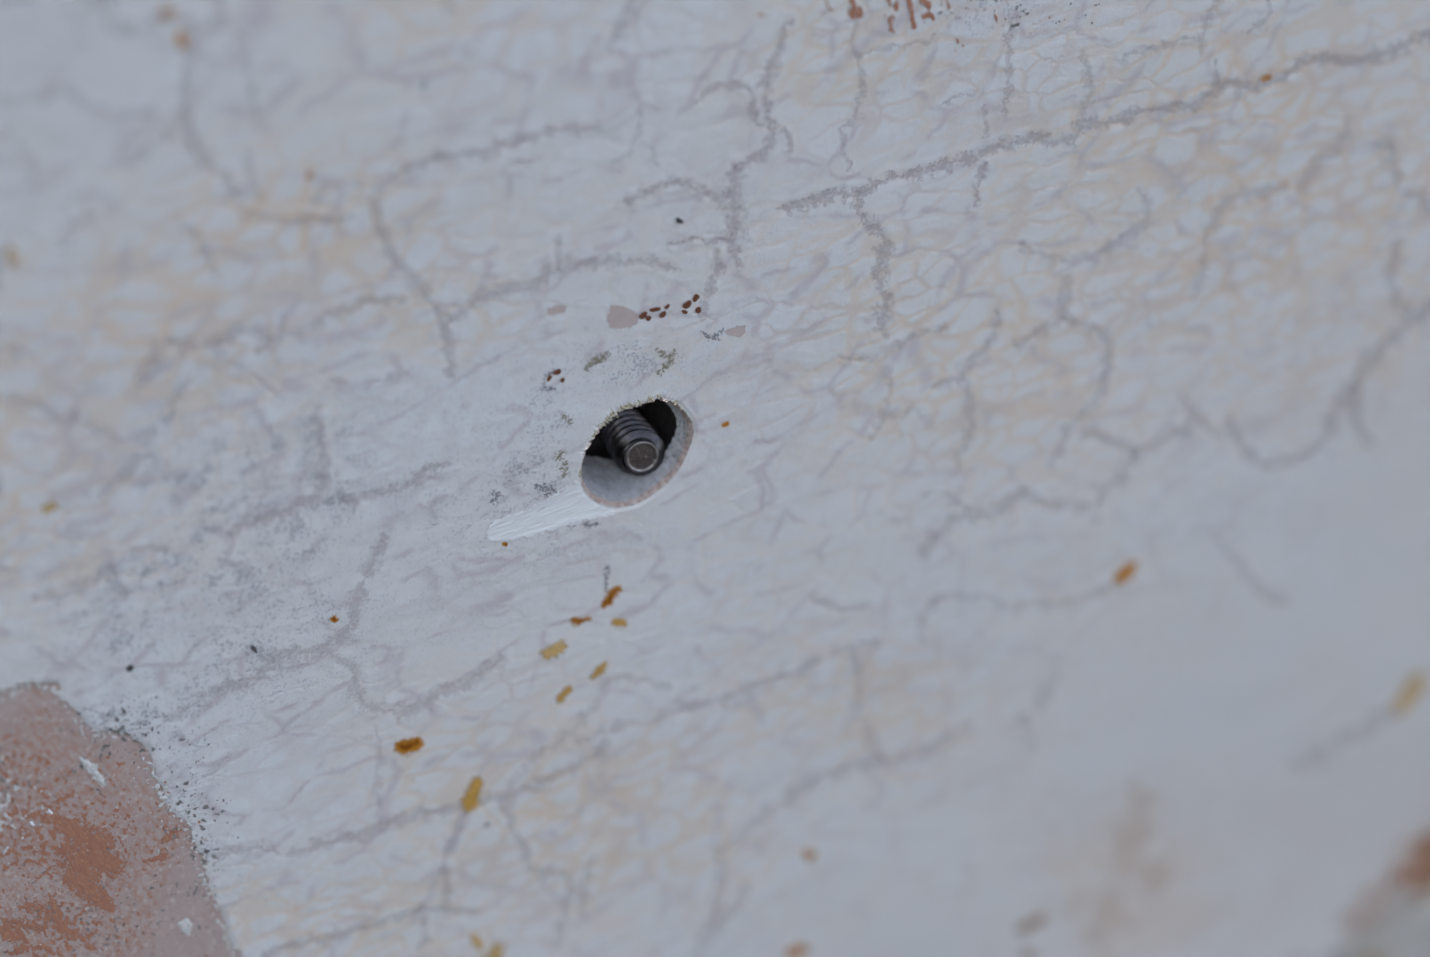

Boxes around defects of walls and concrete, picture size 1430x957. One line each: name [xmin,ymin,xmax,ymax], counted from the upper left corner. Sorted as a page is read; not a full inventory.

peeling [824,0,864,19]
peeling [884,0,1072,40]
rust [571,586,627,627]
rust [540,640,567,661]
rust [590,662,607,679]
rust [556,685,572,702]
rust [394,737,424,755]
rust [461,777,484,812]
peeling [0,669,251,957]
rust [470,934,503,957]